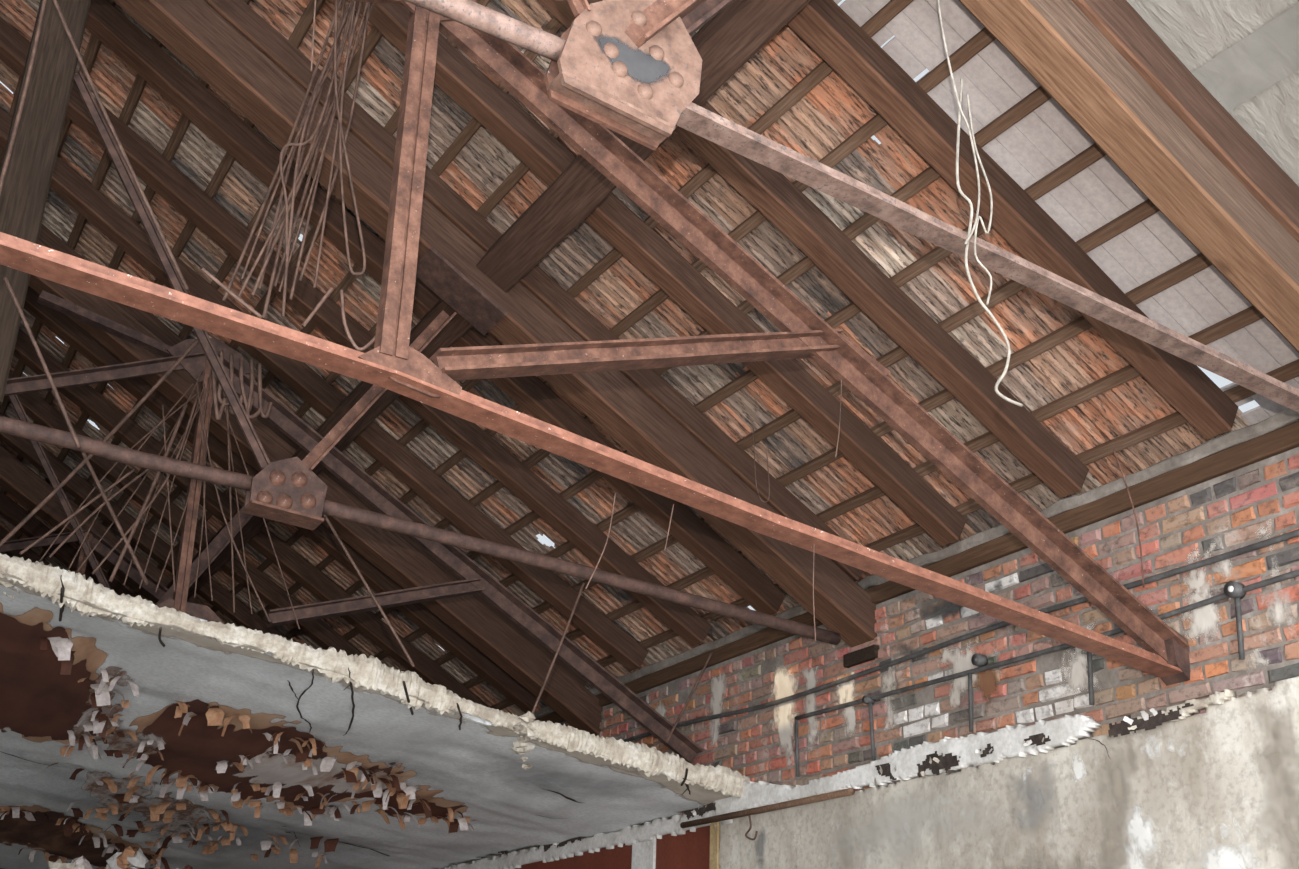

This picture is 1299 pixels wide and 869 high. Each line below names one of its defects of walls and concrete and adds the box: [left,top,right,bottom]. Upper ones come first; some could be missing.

peeling [0,553,750,869]
spalling [1108,703,1194,737]
spalling [1023,733,1051,748]
spalling [917,743,994,777]